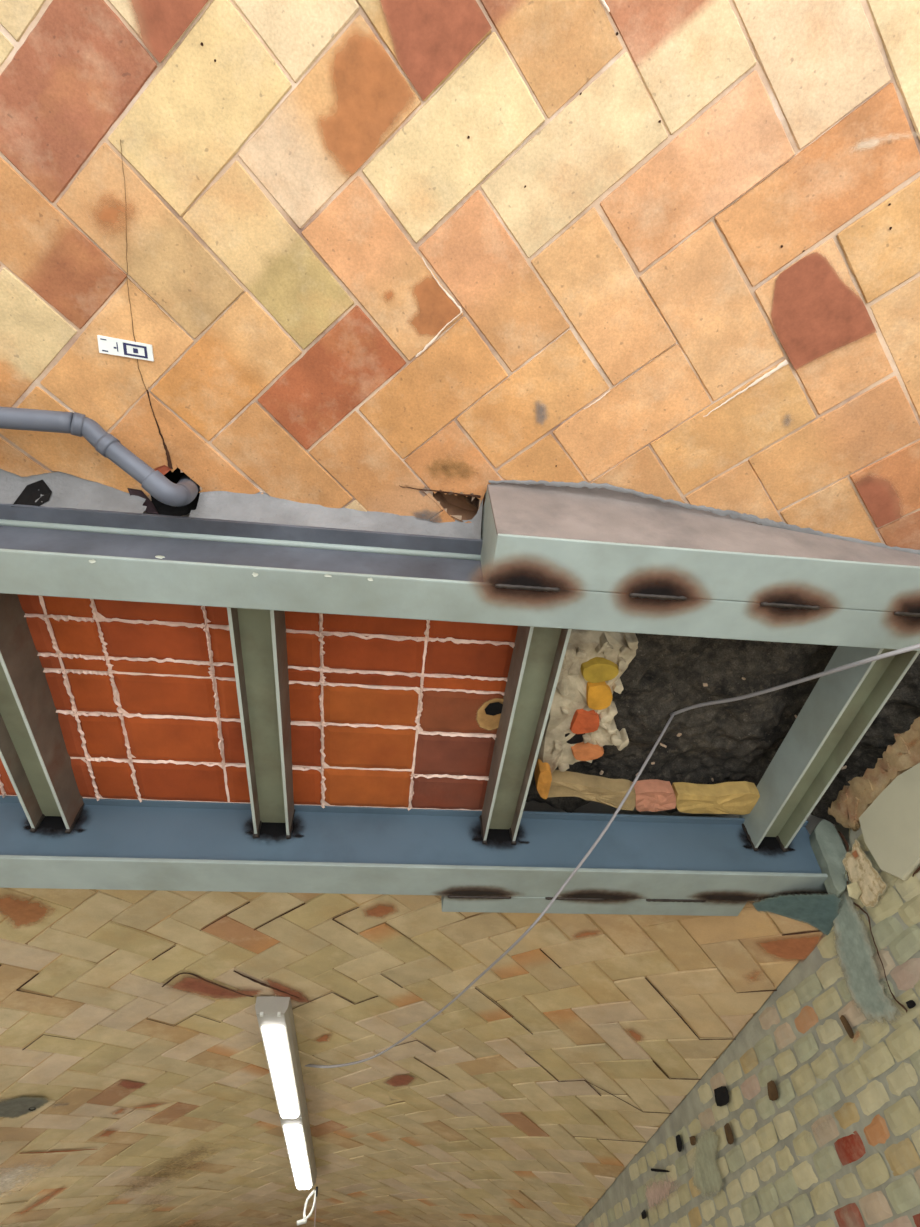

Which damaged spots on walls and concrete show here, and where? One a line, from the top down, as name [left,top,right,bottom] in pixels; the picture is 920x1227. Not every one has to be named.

crack [120,139,173,469]
spalling [400,485,485,523]
spalling [534,629,760,815]
spalling [828,717,920,908]